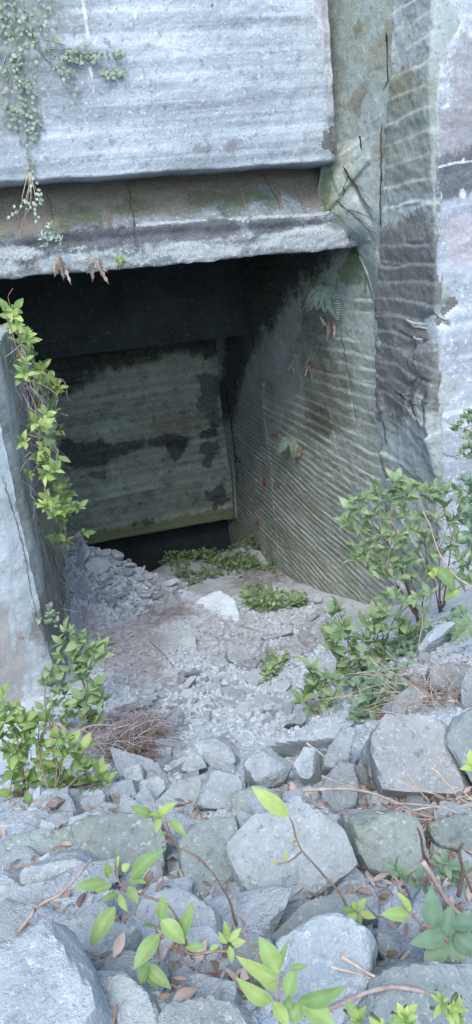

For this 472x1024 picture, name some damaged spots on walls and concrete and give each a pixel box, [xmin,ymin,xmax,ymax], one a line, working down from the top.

crack [126,183,137,249]
crack [335,125,382,246]
damp [23,210,443,479]